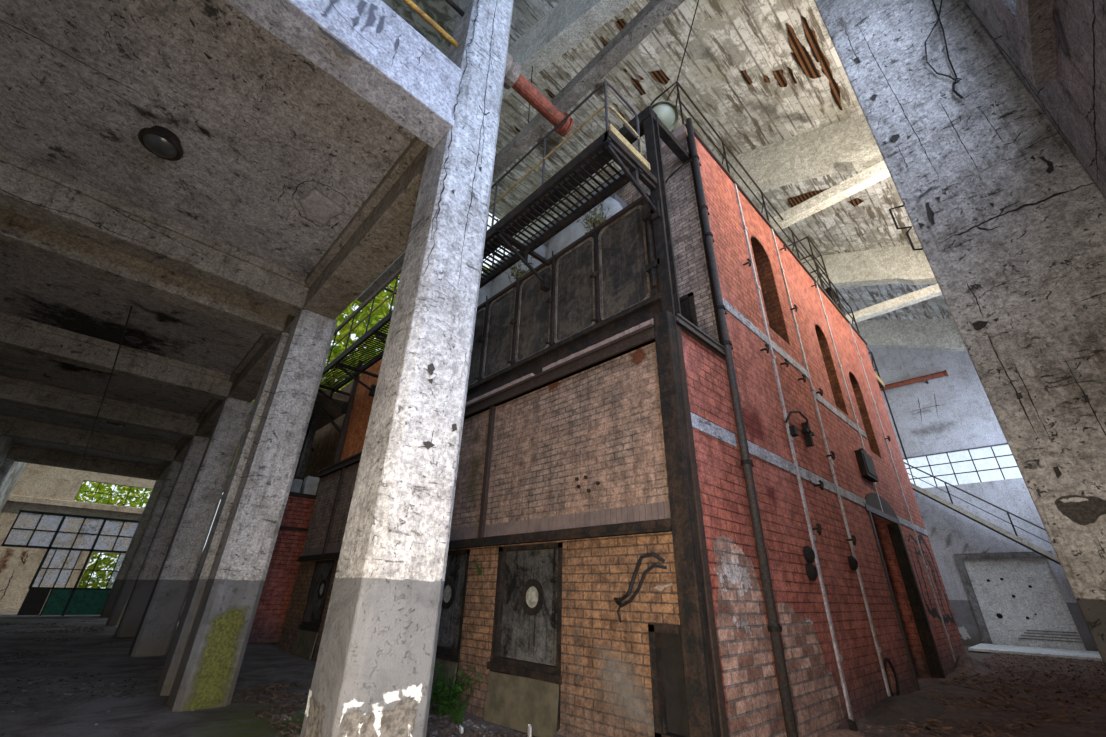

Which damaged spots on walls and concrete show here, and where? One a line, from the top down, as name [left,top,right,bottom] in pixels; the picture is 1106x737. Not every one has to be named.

peeling [319,27,362,60]
spalling [623,68,670,95]
spalling [741,16,843,111]
crack [940,0,1098,243]
spalling [788,189,827,208]
spalling [1055,495,1106,525]
peeling [304,689,325,737]
peeling [338,683,423,737]